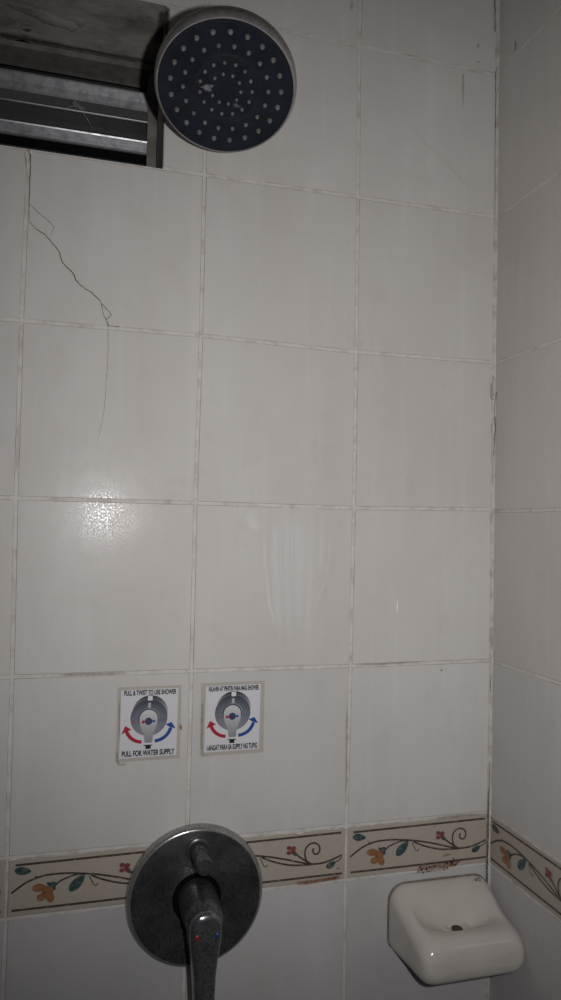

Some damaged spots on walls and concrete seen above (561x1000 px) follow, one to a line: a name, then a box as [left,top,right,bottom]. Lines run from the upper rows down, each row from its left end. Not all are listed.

crack [28,149,120,438]